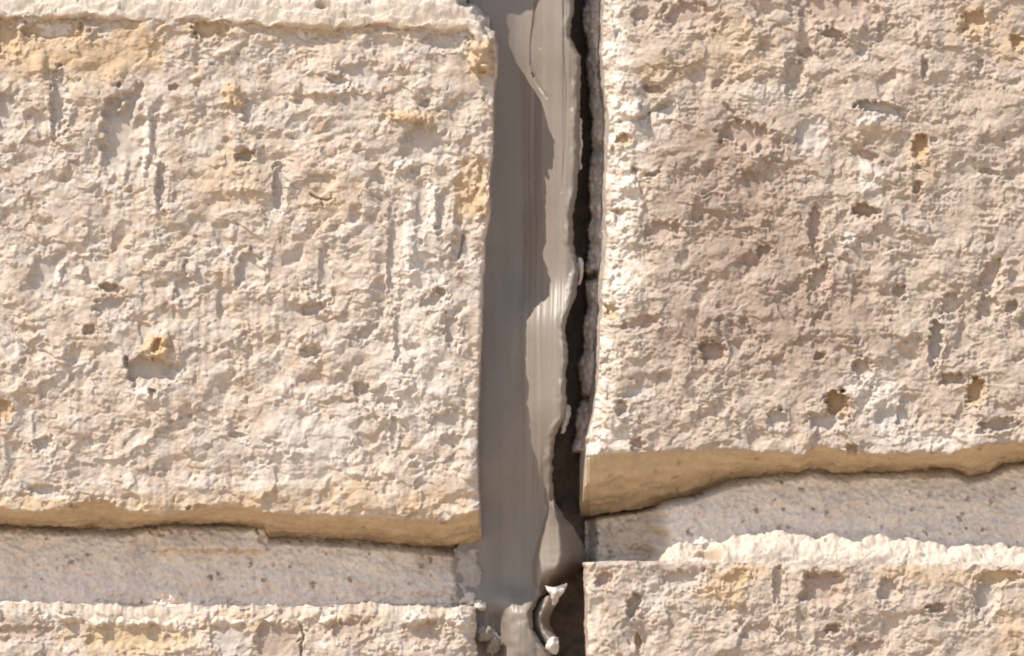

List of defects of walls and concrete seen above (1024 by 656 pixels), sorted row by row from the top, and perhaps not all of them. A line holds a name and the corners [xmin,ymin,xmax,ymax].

crack [529,0,591,656]